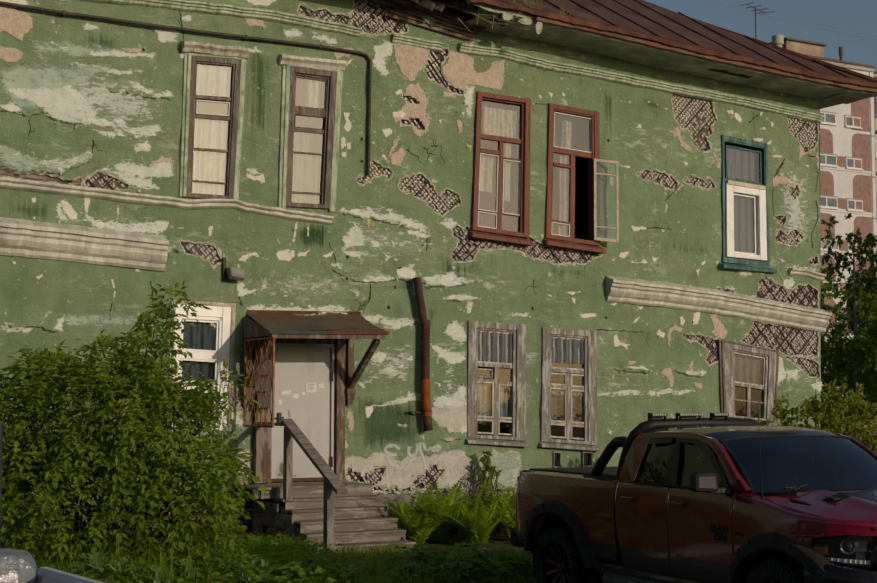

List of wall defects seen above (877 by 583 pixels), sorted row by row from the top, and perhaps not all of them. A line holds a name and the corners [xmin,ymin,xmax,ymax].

peeling [153,15,192,58]
peeling [0,0,174,192]
spalling [618,94,721,193]
peeling [56,198,186,236]
spalling [168,225,222,270]
flaking render [236,0,603,493]
spalling [715,254,821,309]
peeling [772,117,819,249]
spalling [740,321,824,393]